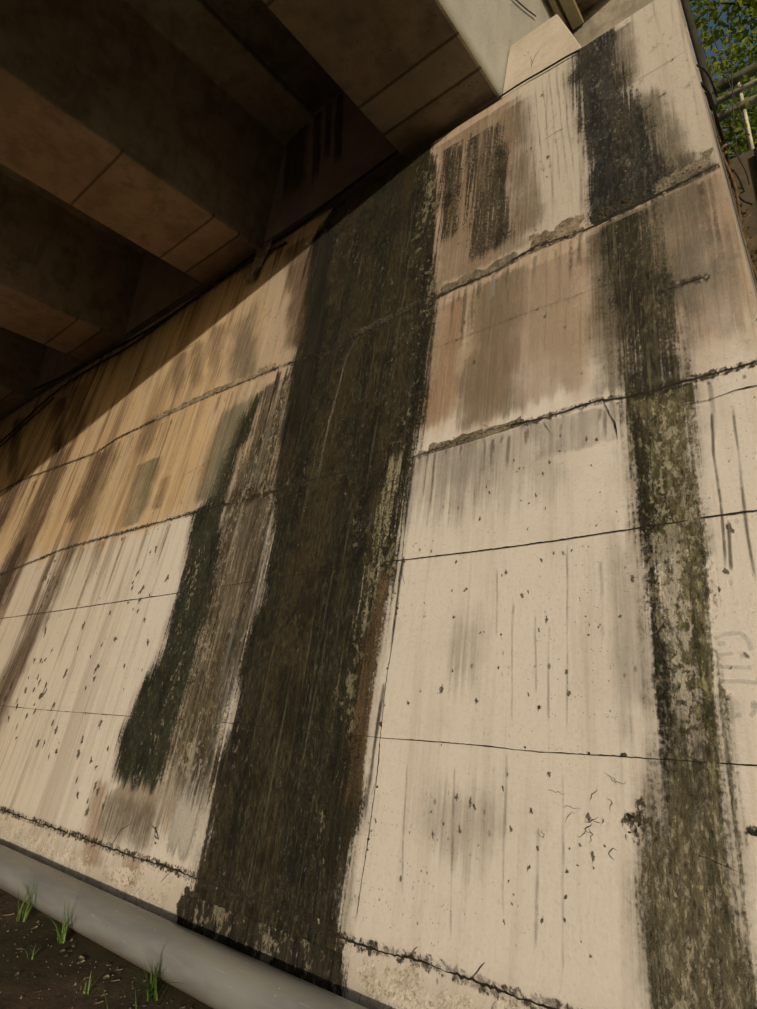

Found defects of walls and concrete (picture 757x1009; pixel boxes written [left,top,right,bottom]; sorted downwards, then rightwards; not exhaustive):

crack [0,164,720,492]
water stain [0,603,44,721]
water stain [0,397,82,609]
water stain [62,448,113,567]
water stain [105,93,530,984]
crack [0,360,757,1009]
water stain [568,23,757,1009]